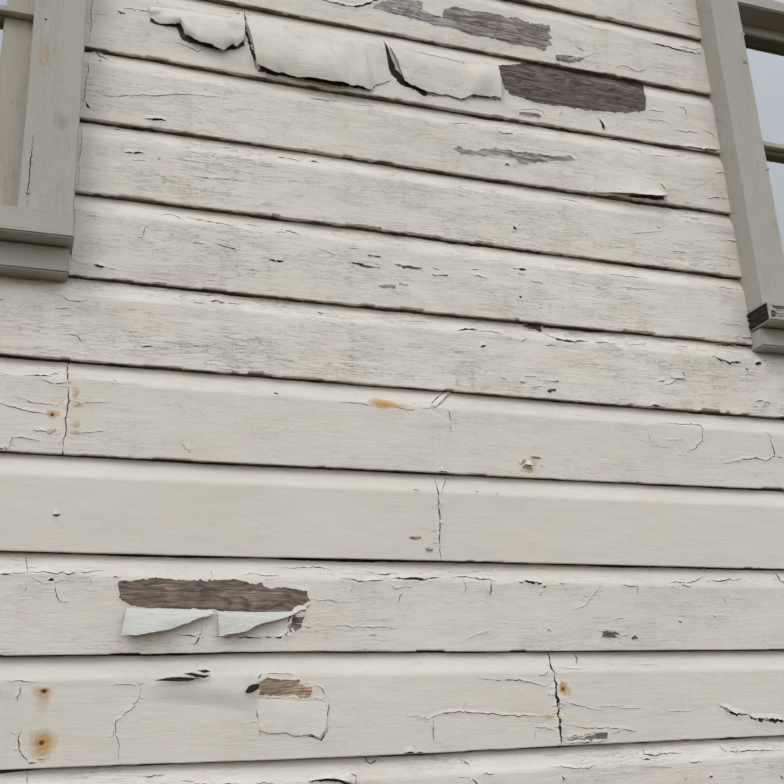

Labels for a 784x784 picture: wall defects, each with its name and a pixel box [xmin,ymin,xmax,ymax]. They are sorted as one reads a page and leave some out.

peeling [115,0,649,120]
peeling [451,144,577,166]
peeling [588,168,668,202]
crack [711,229,756,377]
crack [0,364,141,452]
corrosion [341,399,432,413]
crack [279,475,496,639]
peeling [0,556,313,648]
corrosion [36,736,49,750]
peeling [249,670,332,747]
crack [361,652,642,784]
crack [715,701,784,757]